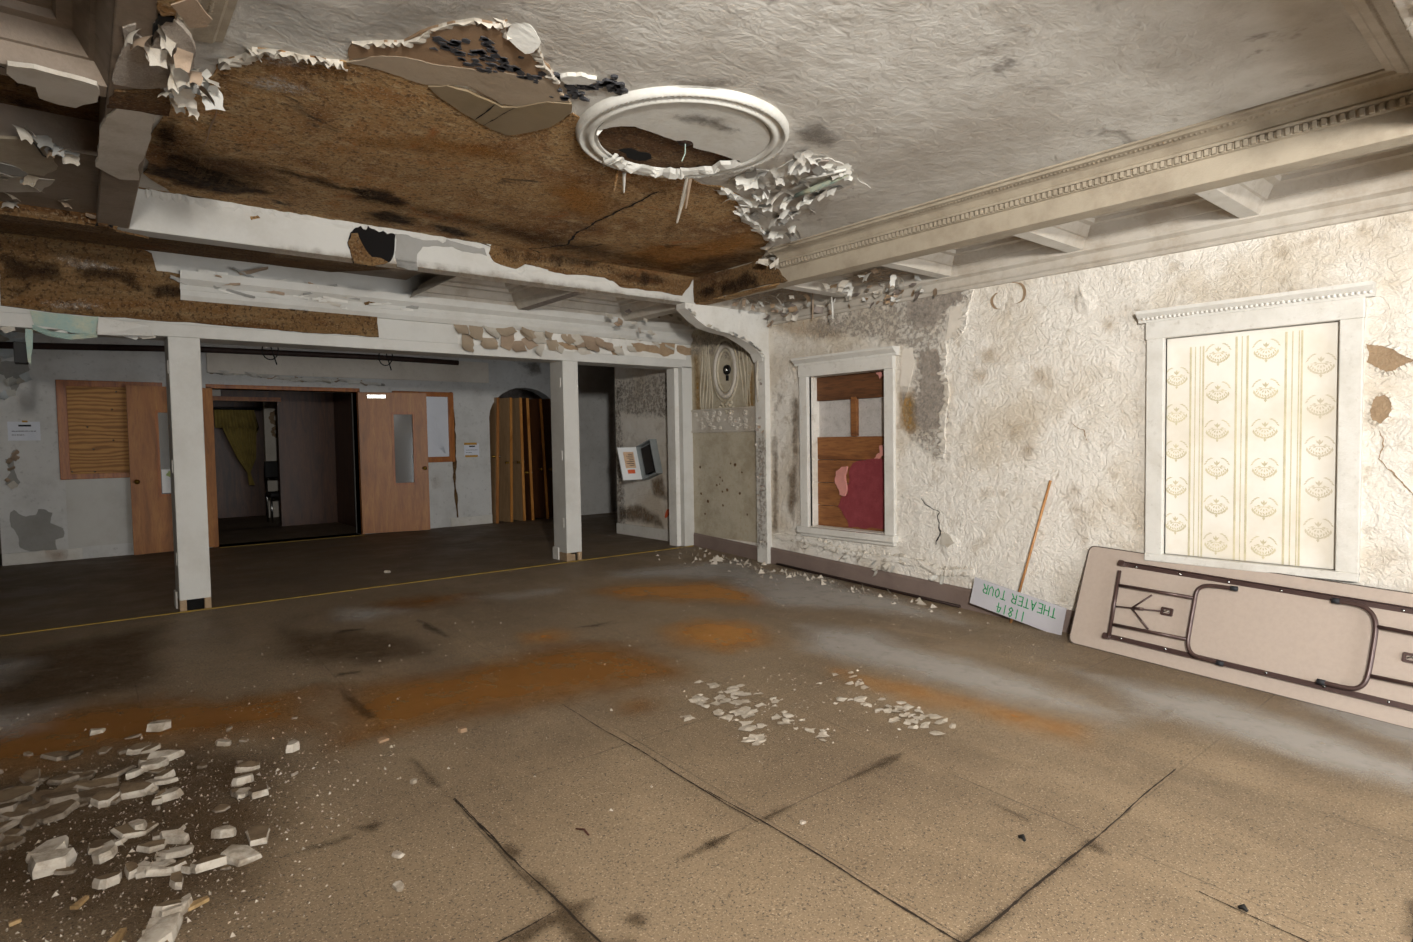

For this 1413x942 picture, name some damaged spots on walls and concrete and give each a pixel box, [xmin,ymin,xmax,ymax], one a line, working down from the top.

crack [529,191,659,253]
flaking render [0,0,974,584]
flaking render [1364,340,1413,428]
crack [1199,891,1309,942]